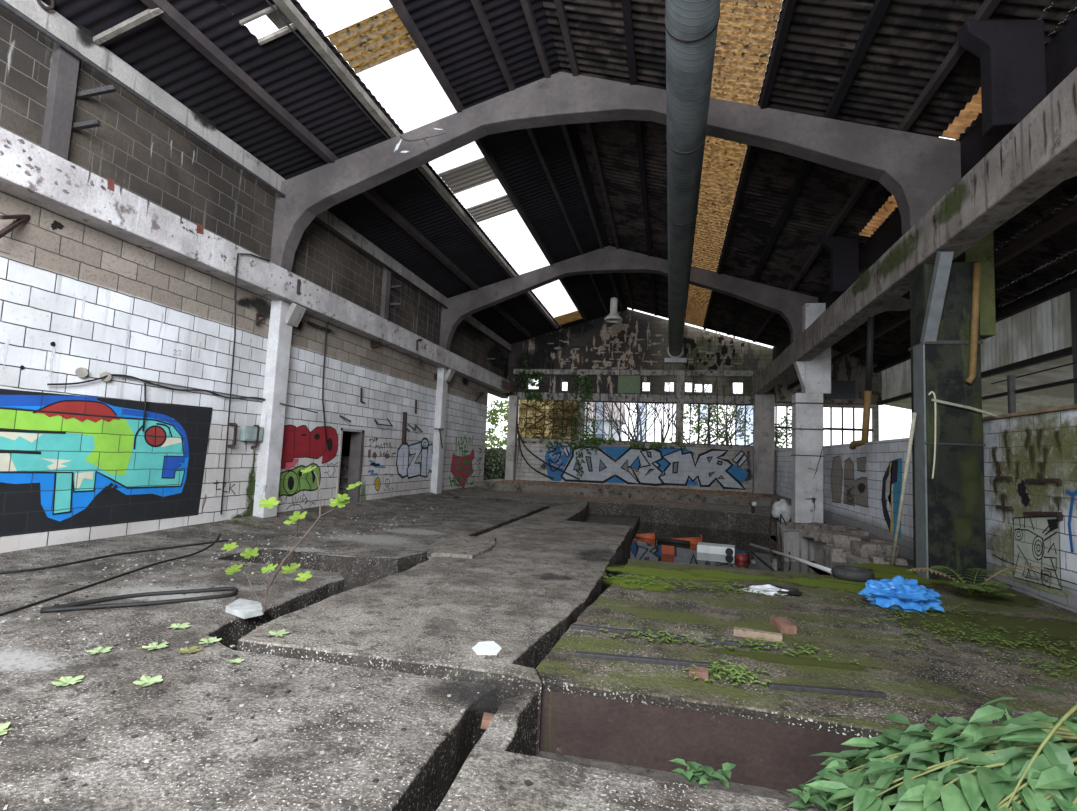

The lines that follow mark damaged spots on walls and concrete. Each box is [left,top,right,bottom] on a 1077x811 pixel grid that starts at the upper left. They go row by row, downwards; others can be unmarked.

peeling [0,139,41,184]
peeling [547,322,664,369]
peeling [683,329,745,371]
damp [992,428,1060,512]